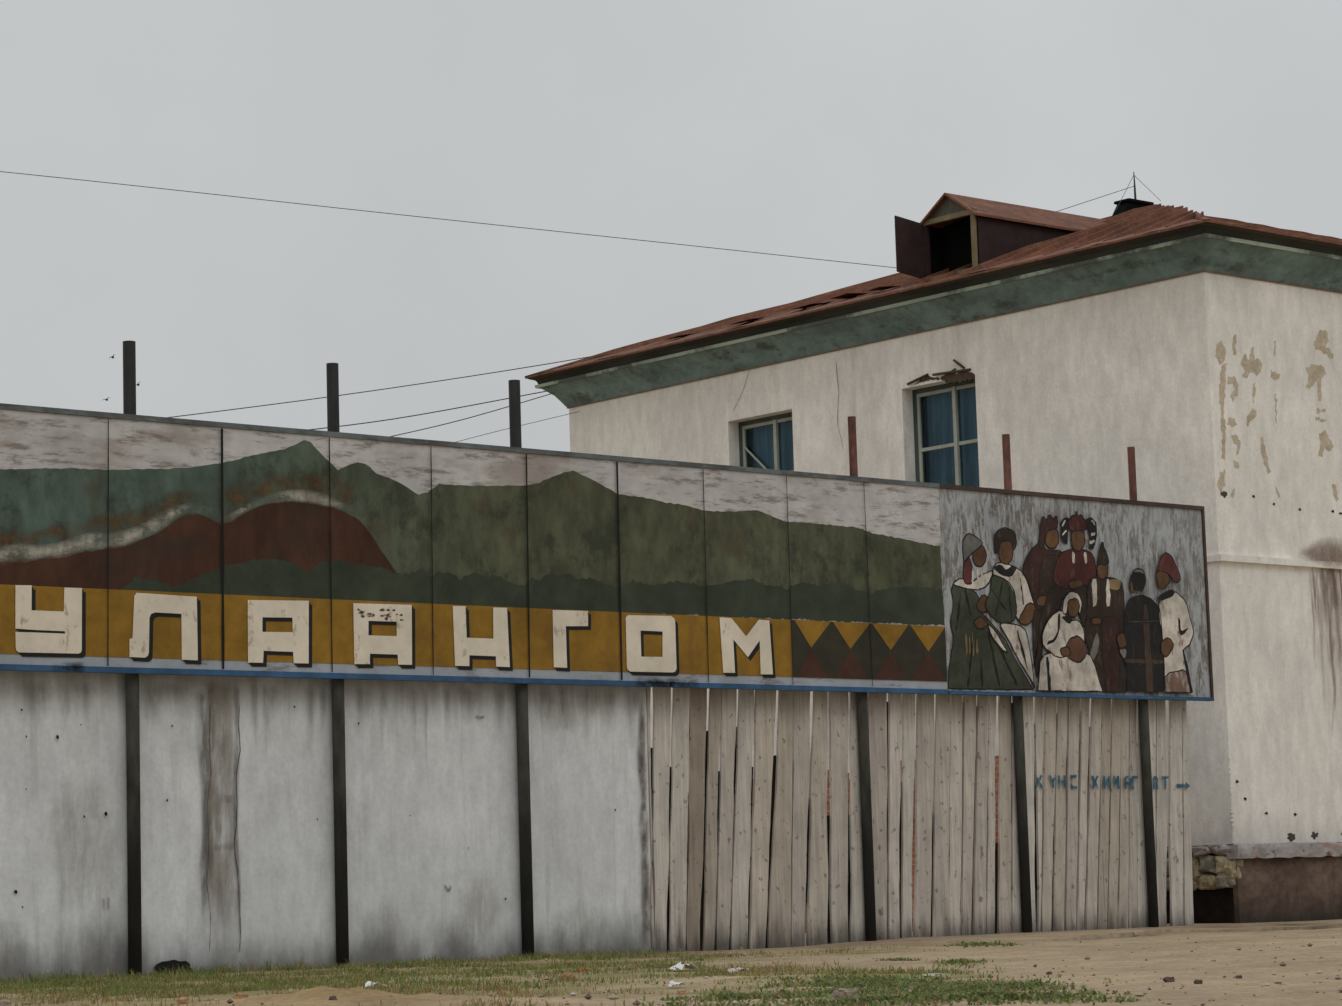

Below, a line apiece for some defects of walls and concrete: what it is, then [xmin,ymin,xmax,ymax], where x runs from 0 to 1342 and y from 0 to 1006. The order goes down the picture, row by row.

peeling [1215,334,1280,506]
peeling [1306,330,1334,457]
damp [204,790,240,901]